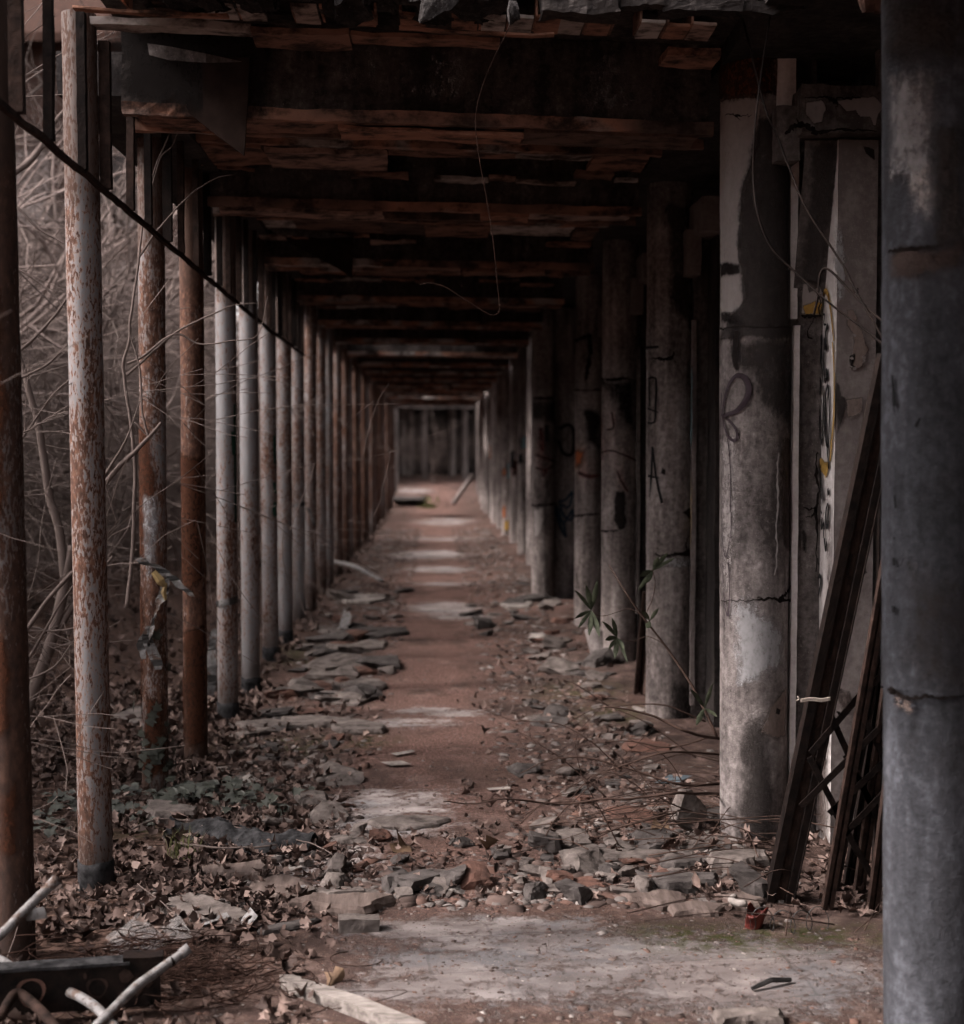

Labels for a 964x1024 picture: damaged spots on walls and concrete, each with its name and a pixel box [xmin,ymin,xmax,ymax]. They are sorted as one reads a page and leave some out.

flaking render [805,96,882,126]
leakage [720,116,807,575]
rust [139,428,157,557]
rust [180,450,203,597]
crack [721,585,791,603]
rust [0,634,10,733]
rust [183,625,206,747]
crack [887,686,964,701]
leakage [738,716,776,841]